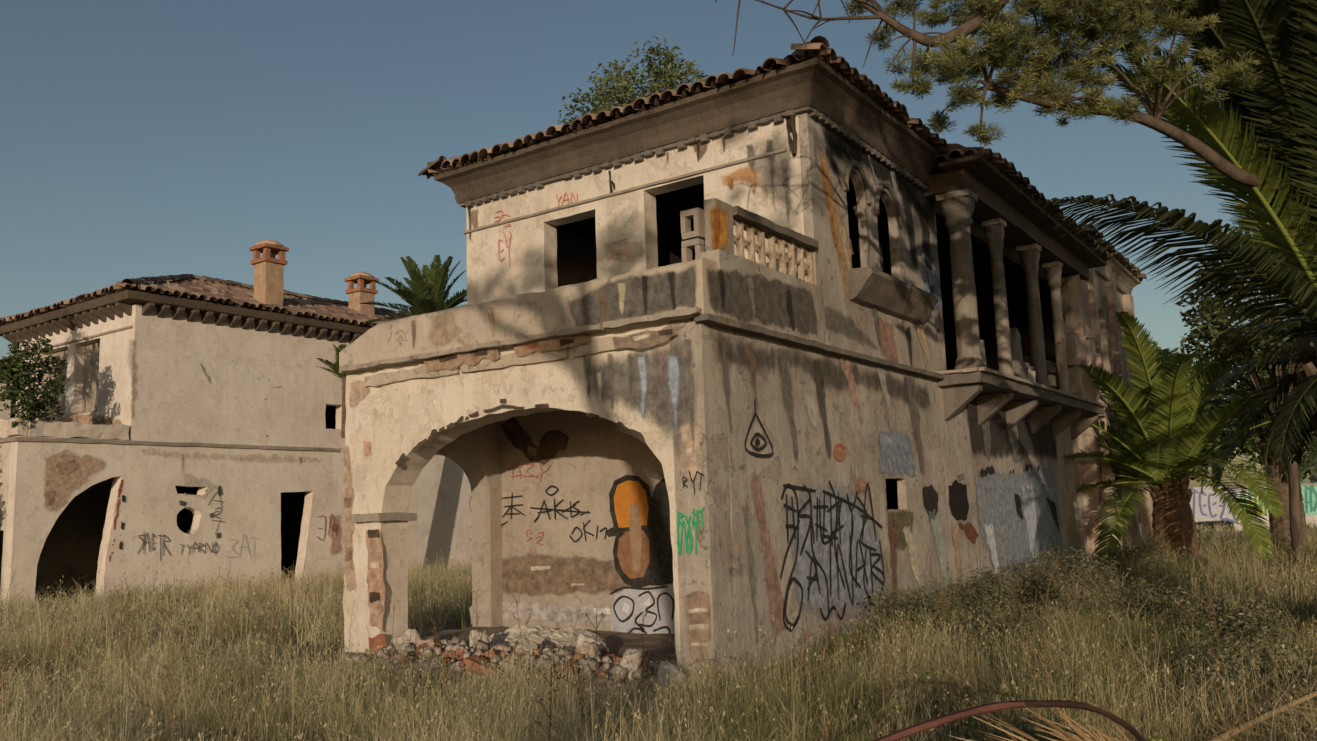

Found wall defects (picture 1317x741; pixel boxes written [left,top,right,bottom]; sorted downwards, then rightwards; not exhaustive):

flaking render [349,381,370,407]
flaking render [395,399,569,467]
flaking render [45,450,105,510]
flaking render [330,441,387,652]
flaking render [502,554,629,626]